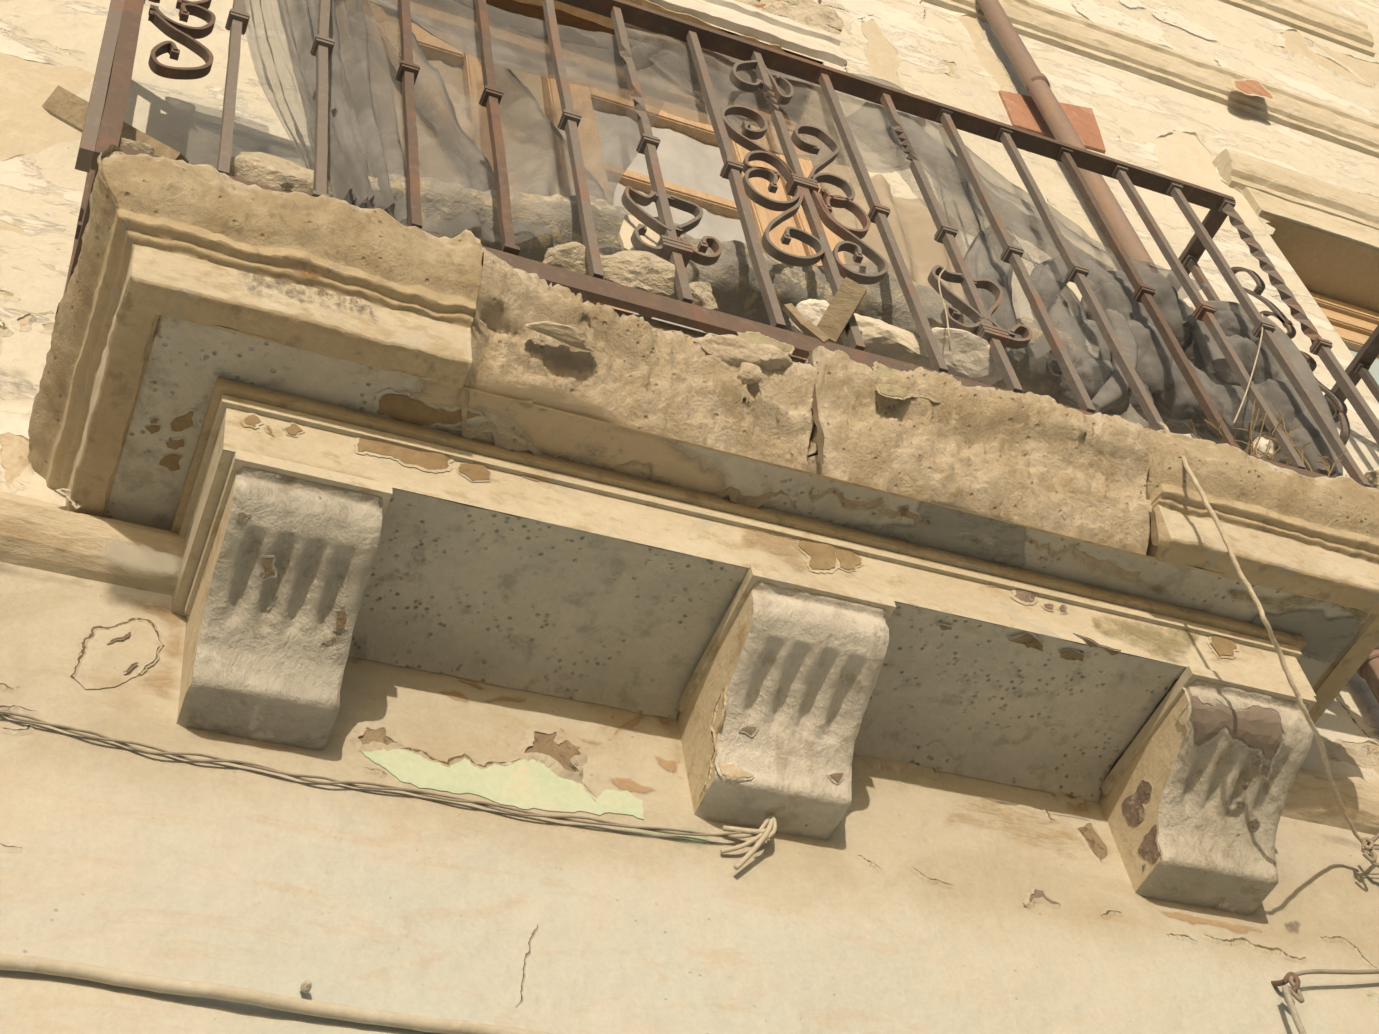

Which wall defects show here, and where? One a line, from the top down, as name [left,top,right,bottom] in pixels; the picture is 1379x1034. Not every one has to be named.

peeling [0,37,96,176]
spalling [514,0,614,29]
peeling [734,0,916,95]
peeling [1256,27,1379,91]
spalling [144,409,197,472]
spalling [240,412,305,437]
crack [809,349,825,464]
peeling [349,719,647,834]
spalling [1182,687,1286,831]
crack [0,840,22,853]
spalling [1122,778,1163,875]
crack [515,924,539,1007]